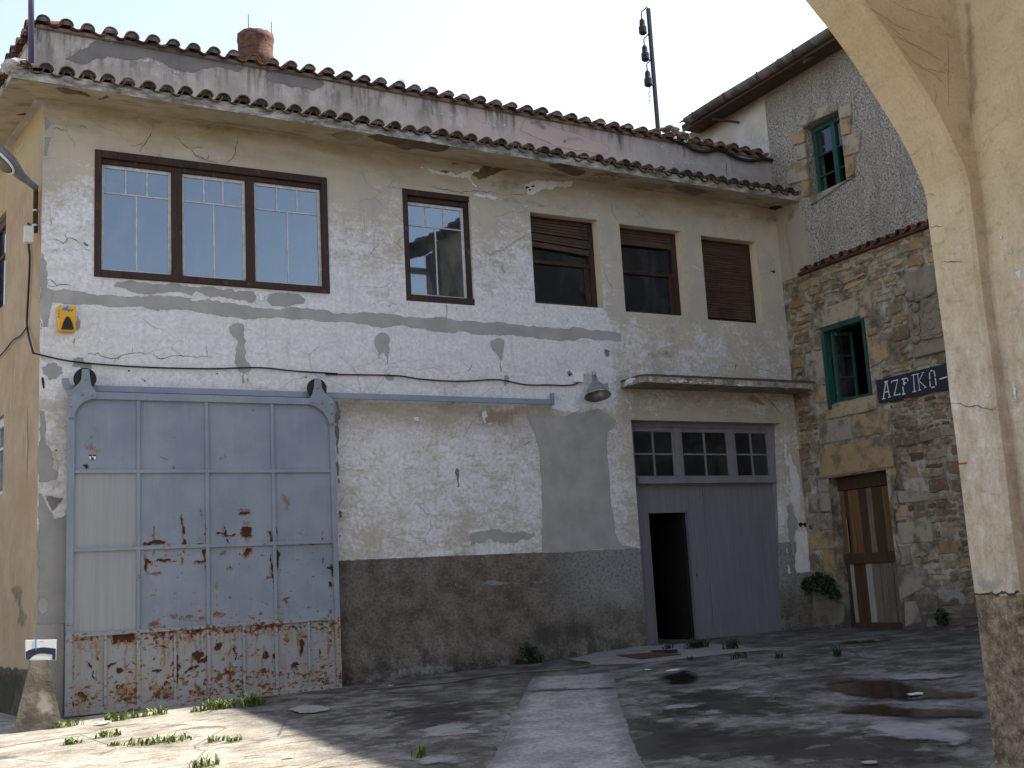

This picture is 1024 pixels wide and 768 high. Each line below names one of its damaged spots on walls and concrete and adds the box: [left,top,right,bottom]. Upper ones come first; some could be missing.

flaking render [67,40,243,73]
flaking render [265,70,324,91]
flaking render [411,163,511,201]
peeling [524,163,586,208]
crack [89,345,208,360]
flaking render [46,496,66,517]
rust [143,509,253,575]
rust [266,528,280,588]
rust [78,634,136,701]
rust [147,605,306,702]